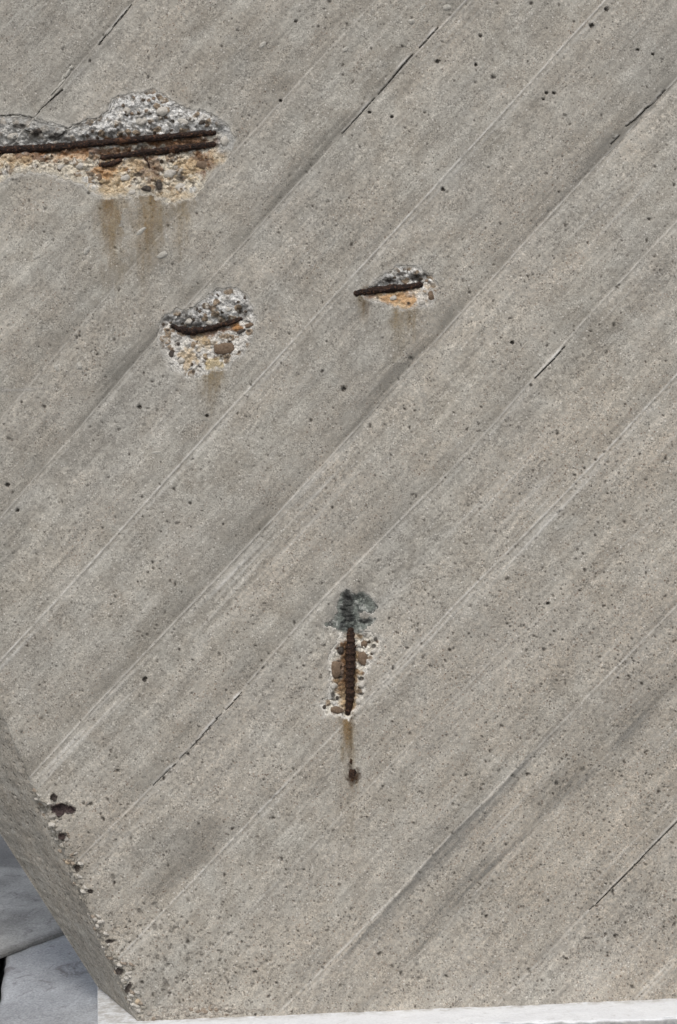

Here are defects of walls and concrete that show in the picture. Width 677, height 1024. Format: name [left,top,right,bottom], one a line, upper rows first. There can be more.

crack [343,28,438,133]
spalling [0,88,236,205]
spalling [157,287,257,379]
spalling [353,266,439,311]
spalling [320,589,381,721]
crack [154,696,239,784]
corrosion [349,759,360,782]
spalling [32,788,147,1018]
crack [589,822,677,910]